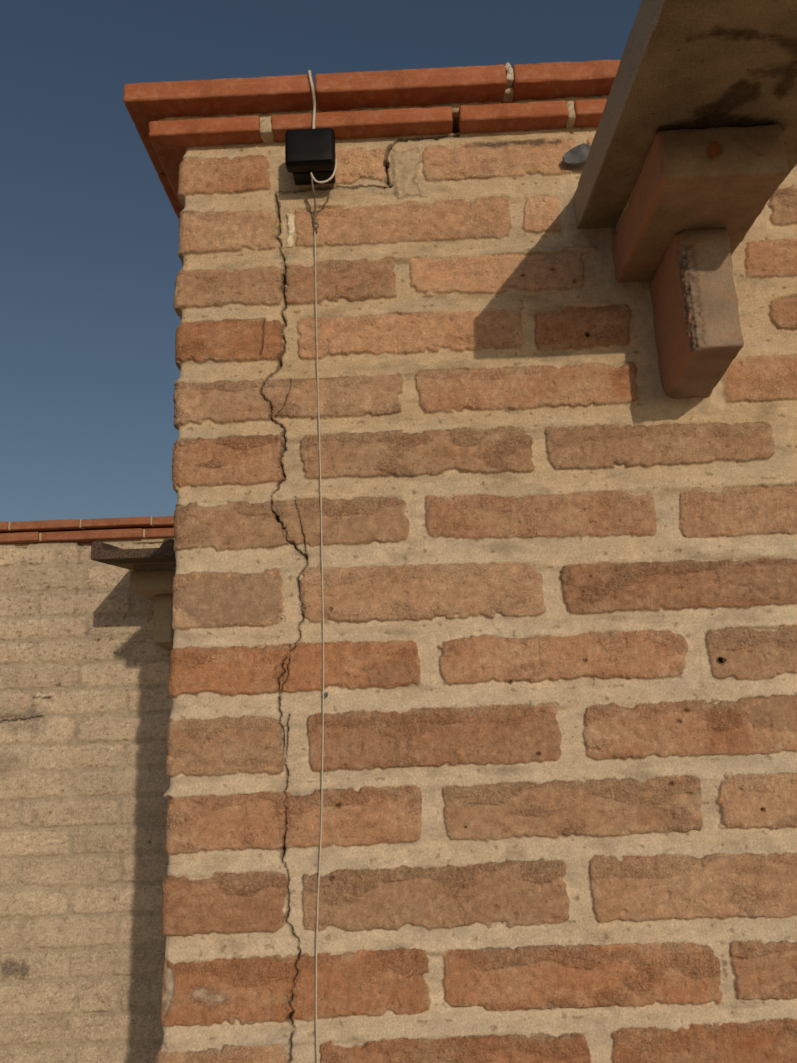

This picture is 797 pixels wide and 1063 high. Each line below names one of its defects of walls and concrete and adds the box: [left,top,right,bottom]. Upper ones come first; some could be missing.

water stain [657,81,782,132]
crack [258,133,461,1063]